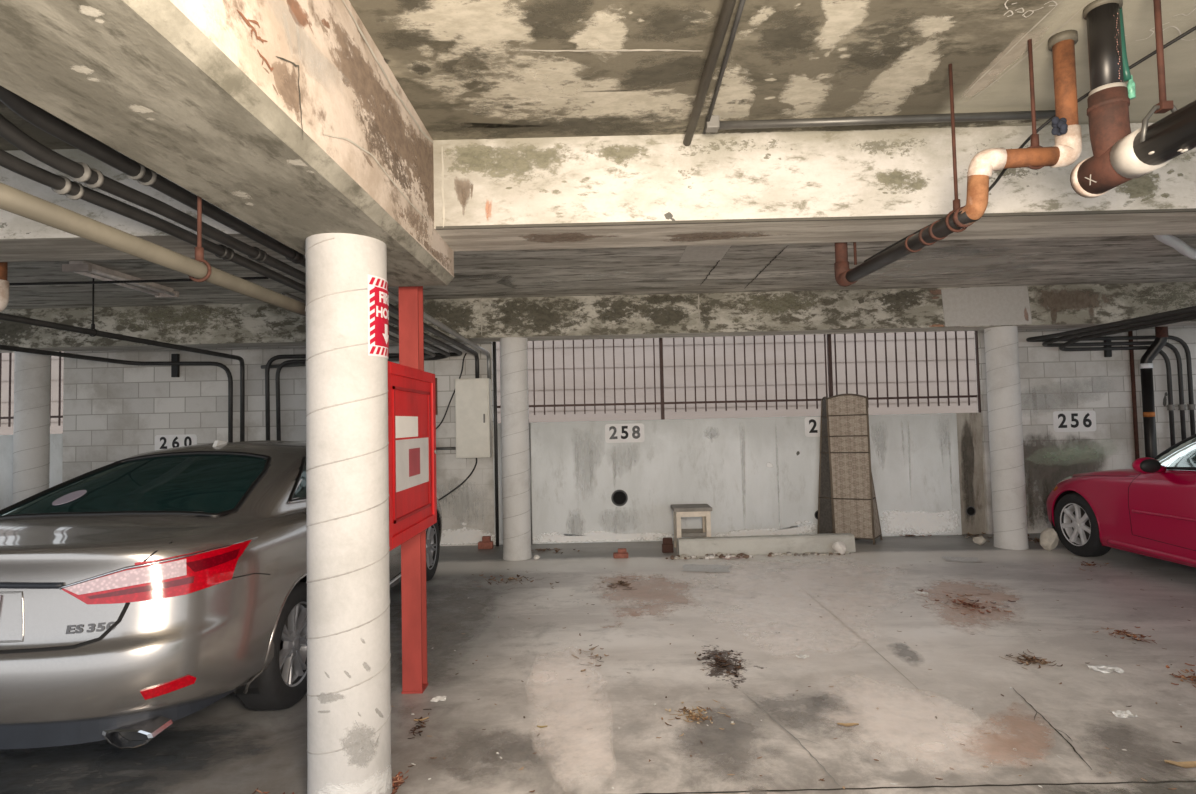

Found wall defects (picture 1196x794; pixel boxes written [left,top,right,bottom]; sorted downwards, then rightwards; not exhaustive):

crack [237,10,303,135]
peeling [264,62,300,122]
leakage [379,20,494,90]
leakage [519,0,593,42]
leakage [619,5,712,90]
leakage [837,8,922,74]
peeling [287,0,451,269]
leakage [445,104,1040,214]
leakage [423,274,712,336]
leakage [1023,435,1105,526]
peeling [341,708,383,767]
crack [1013,688,1092,770]